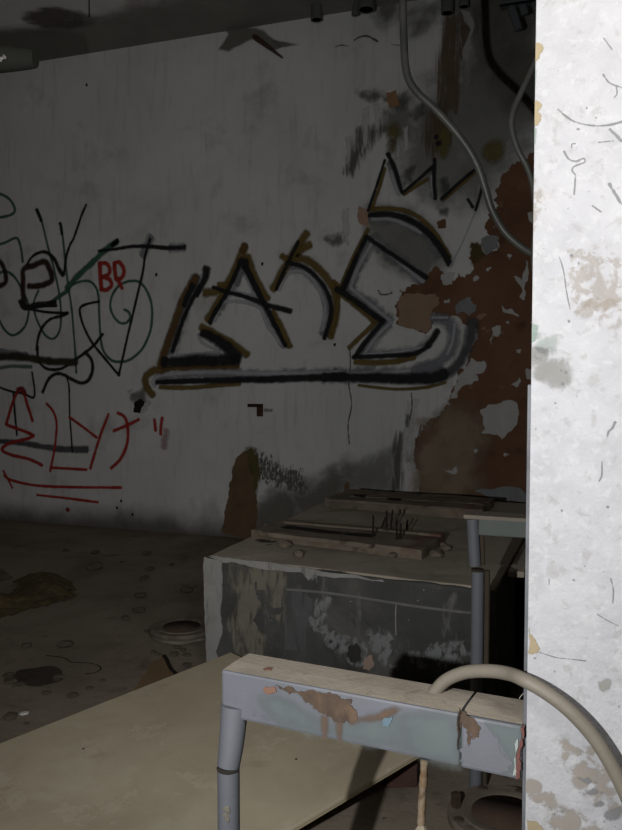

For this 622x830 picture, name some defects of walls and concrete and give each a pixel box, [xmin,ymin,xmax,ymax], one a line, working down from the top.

leakage [0,0,355,61]
leakage [346,0,536,200]
leakage [368,210,439,275]
flaking render [395,100,542,503]
flaking render [221,448,276,542]
peeling [203,556,384,662]
spalling [346,643,375,671]
peeling [264,699,521,776]
flaking render [526,779,600,830]
flaking render [562,741,622,820]